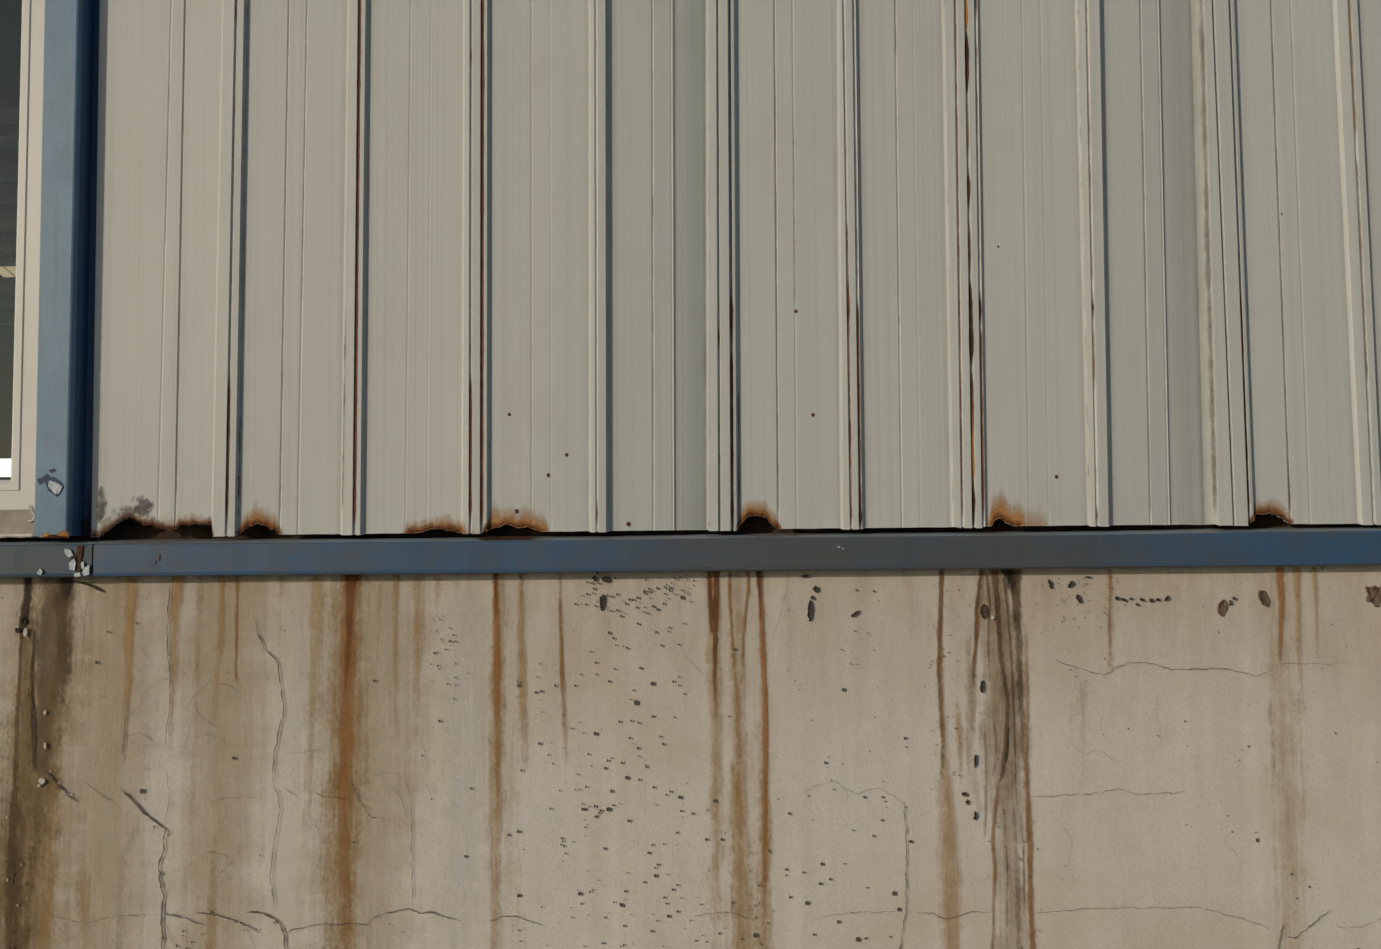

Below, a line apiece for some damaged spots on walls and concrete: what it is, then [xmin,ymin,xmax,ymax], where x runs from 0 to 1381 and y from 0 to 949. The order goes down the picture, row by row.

rust [91,381,282,537]
rust [404,0,548,540]
rust [718,296,780,530]
rust [954,0,1027,527]
rust [1240,297,1293,525]
damp [0,577,105,949]
crack [164,587,172,743]
crack [28,622,456,949]
rust [334,575,361,939]
rust [707,571,769,892]
rust [937,569,1036,949]
crack [1278,914,1326,949]